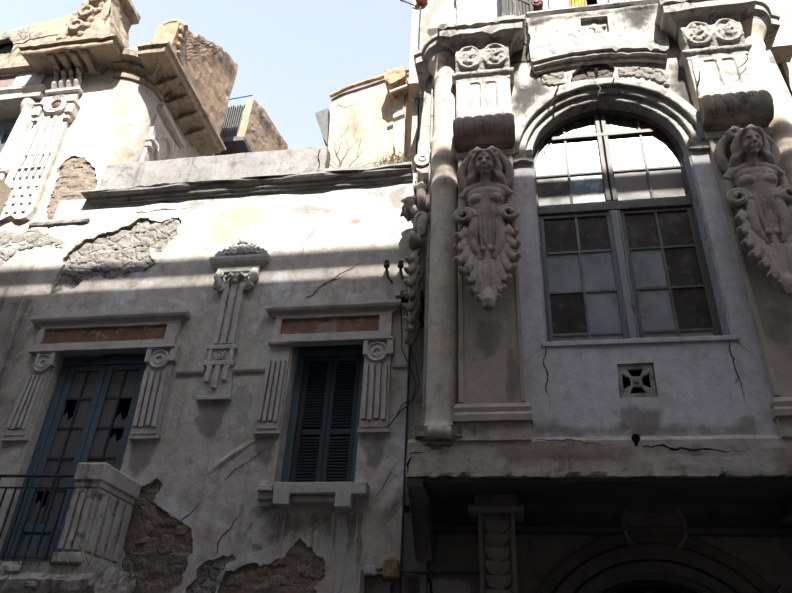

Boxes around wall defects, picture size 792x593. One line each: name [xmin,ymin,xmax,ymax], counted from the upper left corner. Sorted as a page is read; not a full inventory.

flaking render [0,29,28,56]
flaking render [0,157,182,294]
crack [305,262,363,299]
crack [543,348,551,401]
crack [727,330,754,405]
crack [537,439,750,453]
flaking render [121,480,326,593]